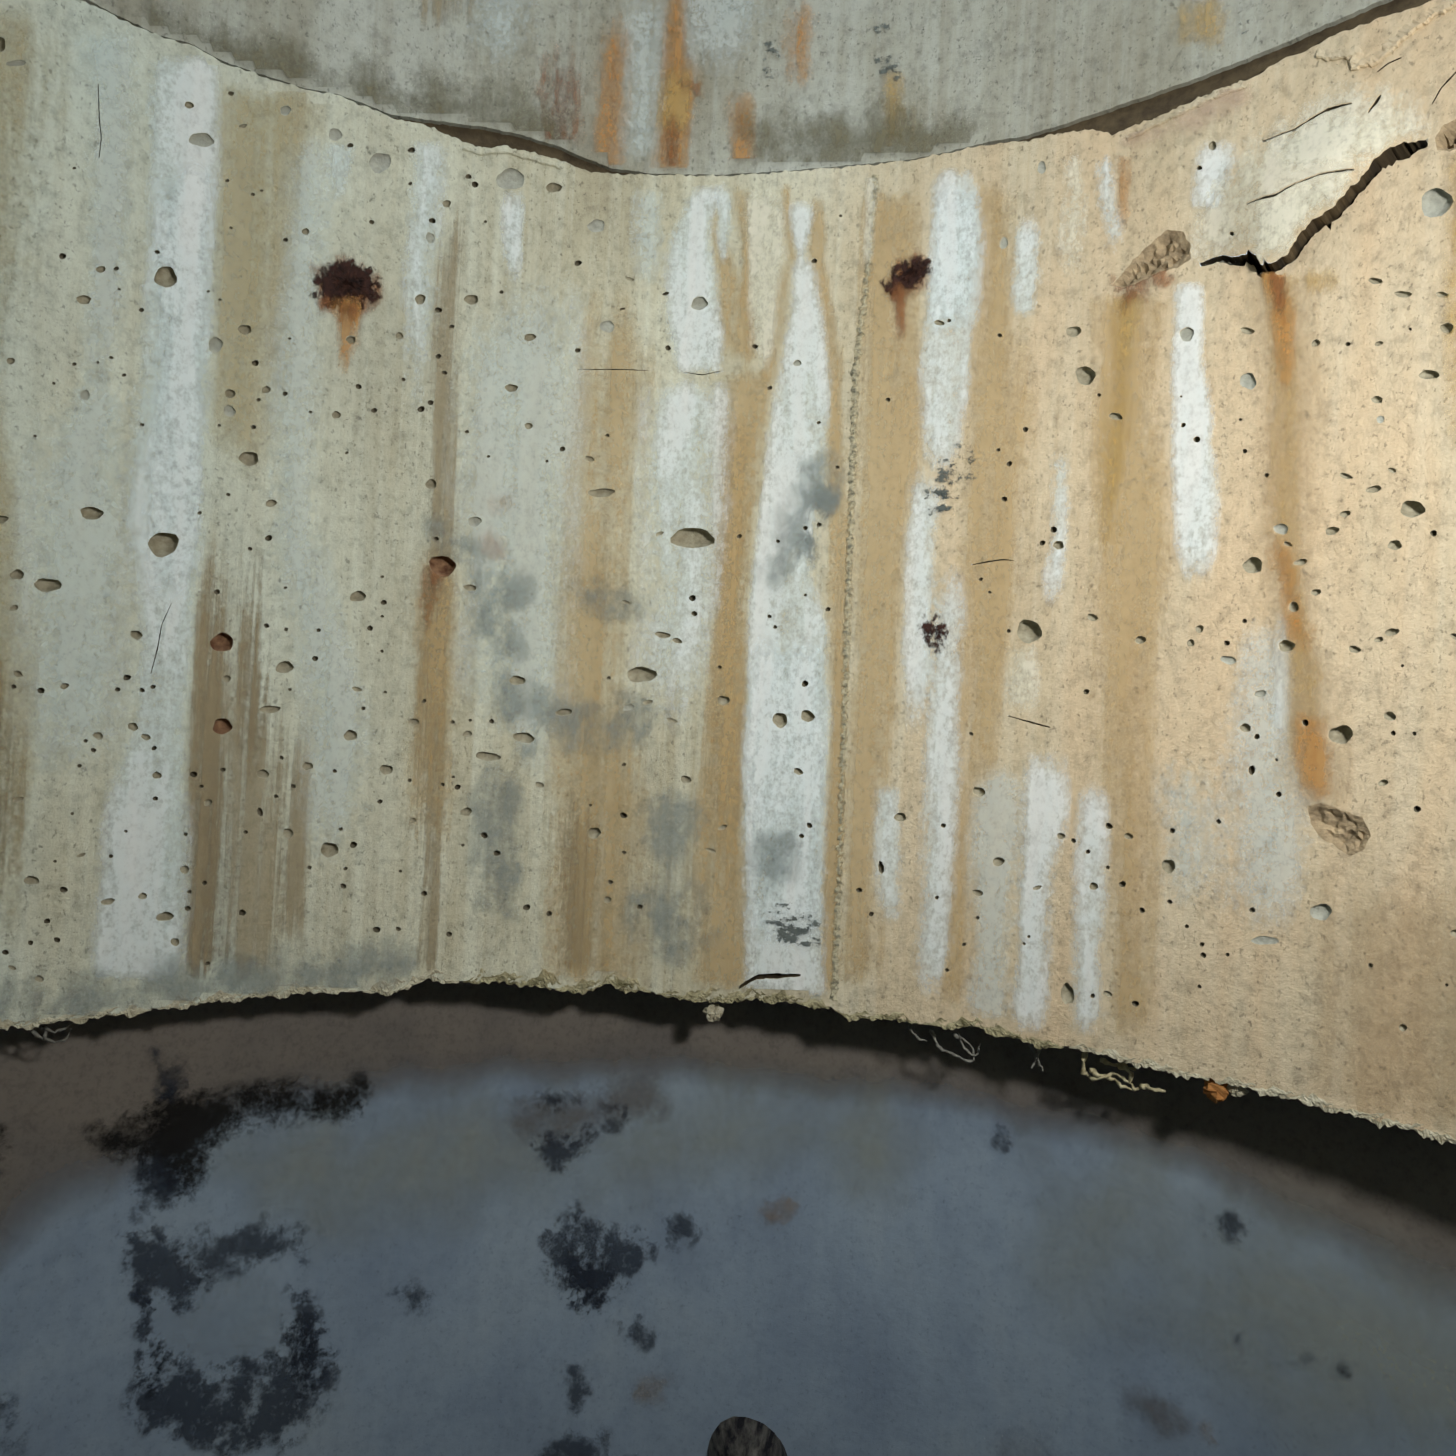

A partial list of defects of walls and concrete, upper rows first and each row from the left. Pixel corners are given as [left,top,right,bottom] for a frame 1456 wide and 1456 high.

peeling [1316,0,1456,71]
crack [1263,57,1402,142]
crack [1433,72,1456,103]
corrosion [313,258,381,361]
corrosion [880,255,933,329]
spalling [1112,230,1191,289]
corrosion [1264,273,1293,431]
crack [1200,140,1428,279]
leakage [1099,284,1218,707]
leakage [654,172,1037,993]
spalling [1308,803,1371,856]
leakage [123,1226,340,1456]